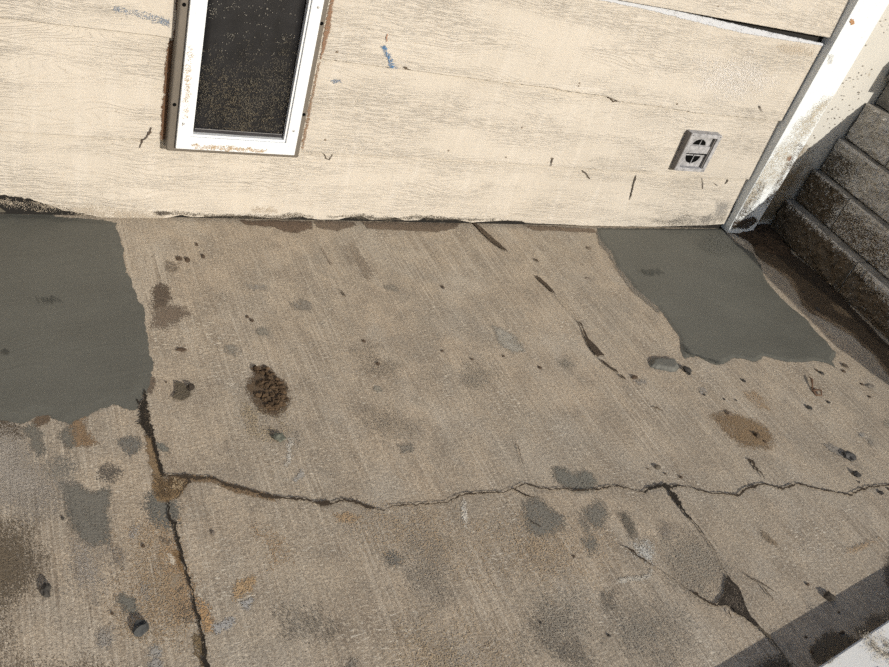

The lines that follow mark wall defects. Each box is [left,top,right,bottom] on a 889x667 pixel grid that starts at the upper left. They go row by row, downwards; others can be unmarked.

water stain [650,197,747,256]
water stain [743,94,889,339]
water stain [147,282,194,333]
water stain [140,490,182,546]
crack [136,389,889,667]